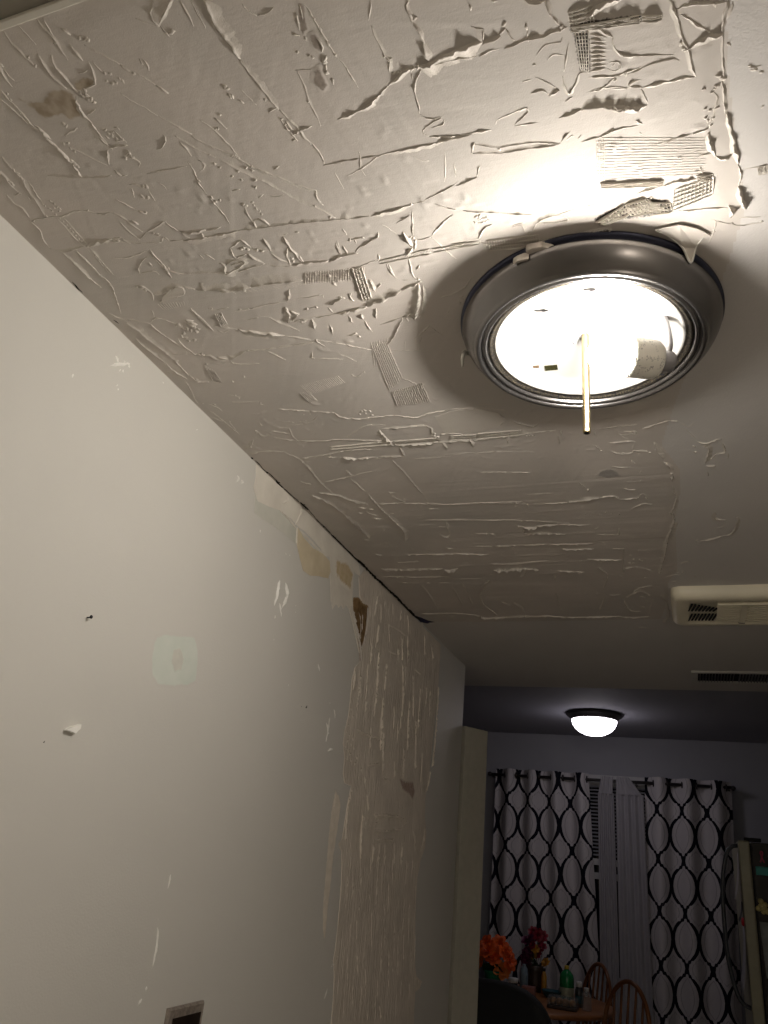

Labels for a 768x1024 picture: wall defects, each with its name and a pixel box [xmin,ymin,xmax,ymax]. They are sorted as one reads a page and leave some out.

peeling [151,0,170,24]
spalling [292,0,334,94]
peeling [16,73,98,135]
peeling [655,224,711,264]
spalling [327,274,354,333]
crack [251,457,420,620]
spalling [351,598,368,659]